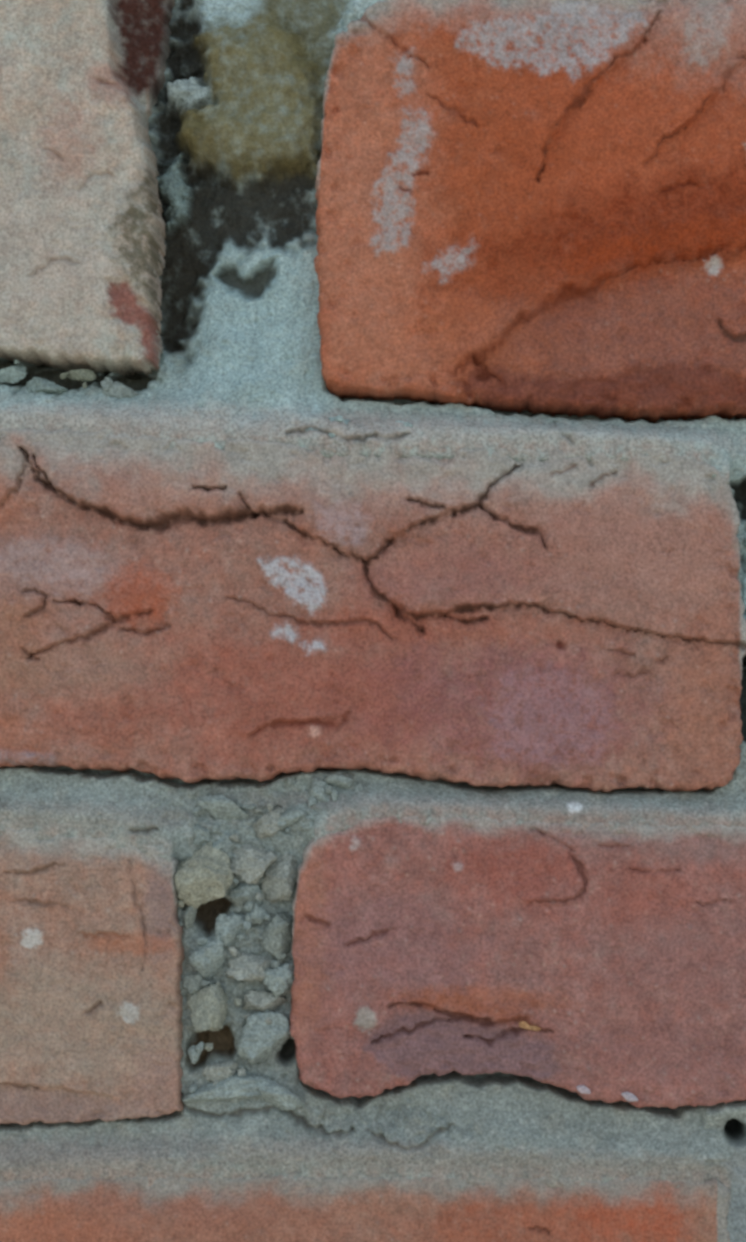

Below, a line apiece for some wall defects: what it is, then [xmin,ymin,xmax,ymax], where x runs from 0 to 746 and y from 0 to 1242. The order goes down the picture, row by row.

crack [352,11,481,128]
crack [535,9,665,183]
crack [642,49,746,168]
crack [446,241,746,383]
crack [0,419,746,681]
spalling [729,475,746,547]
spalling [174,772,363,1111]
spalling [359,1006,568,1084]